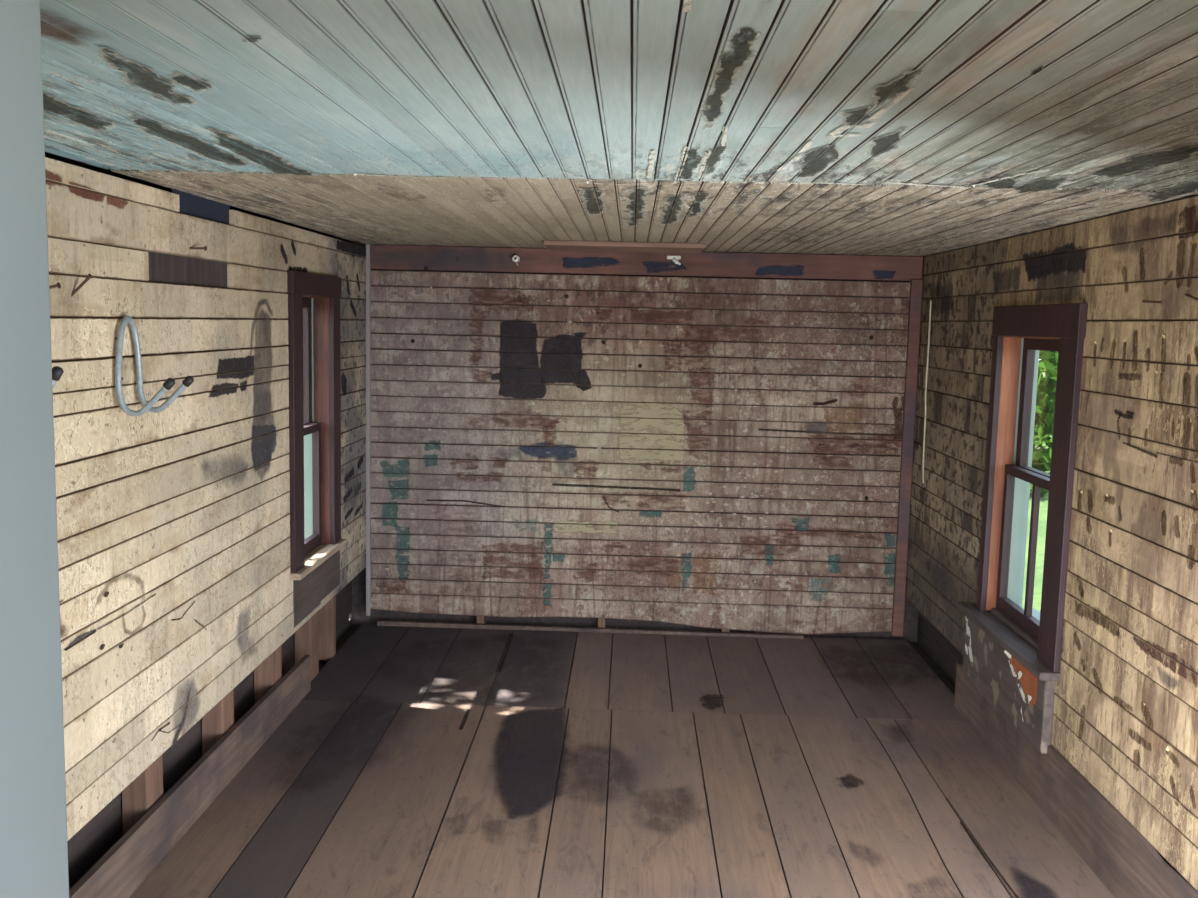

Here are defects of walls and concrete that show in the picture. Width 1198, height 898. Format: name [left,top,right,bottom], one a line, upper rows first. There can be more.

damp [43,94,115,130]
damp [100,47,212,106]
damp [699,27,760,131]
damp [842,70,924,125]
damp [129,113,317,176]
damp [675,143,727,180]
damp [797,144,840,178]
damp [869,128,909,158]
damp [1113,183,1198,293]
peeling [965,616,973,662]
peeling [1004,650,1038,720]
damp [495,708,567,818]